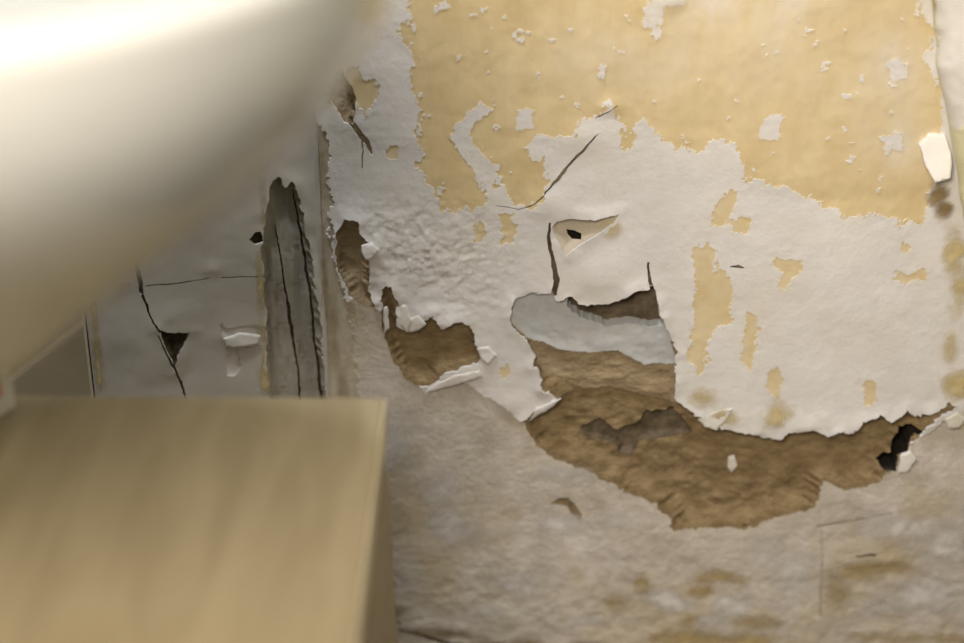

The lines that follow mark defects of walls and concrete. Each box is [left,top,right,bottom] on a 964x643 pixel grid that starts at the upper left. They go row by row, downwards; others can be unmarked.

spalling [332,66,380,168]
crack [506,106,618,209]
peeling [396,0,964,247]
crack [547,223,560,295]
crack [129,275,186,397]
flaking render [220,123,964,643]